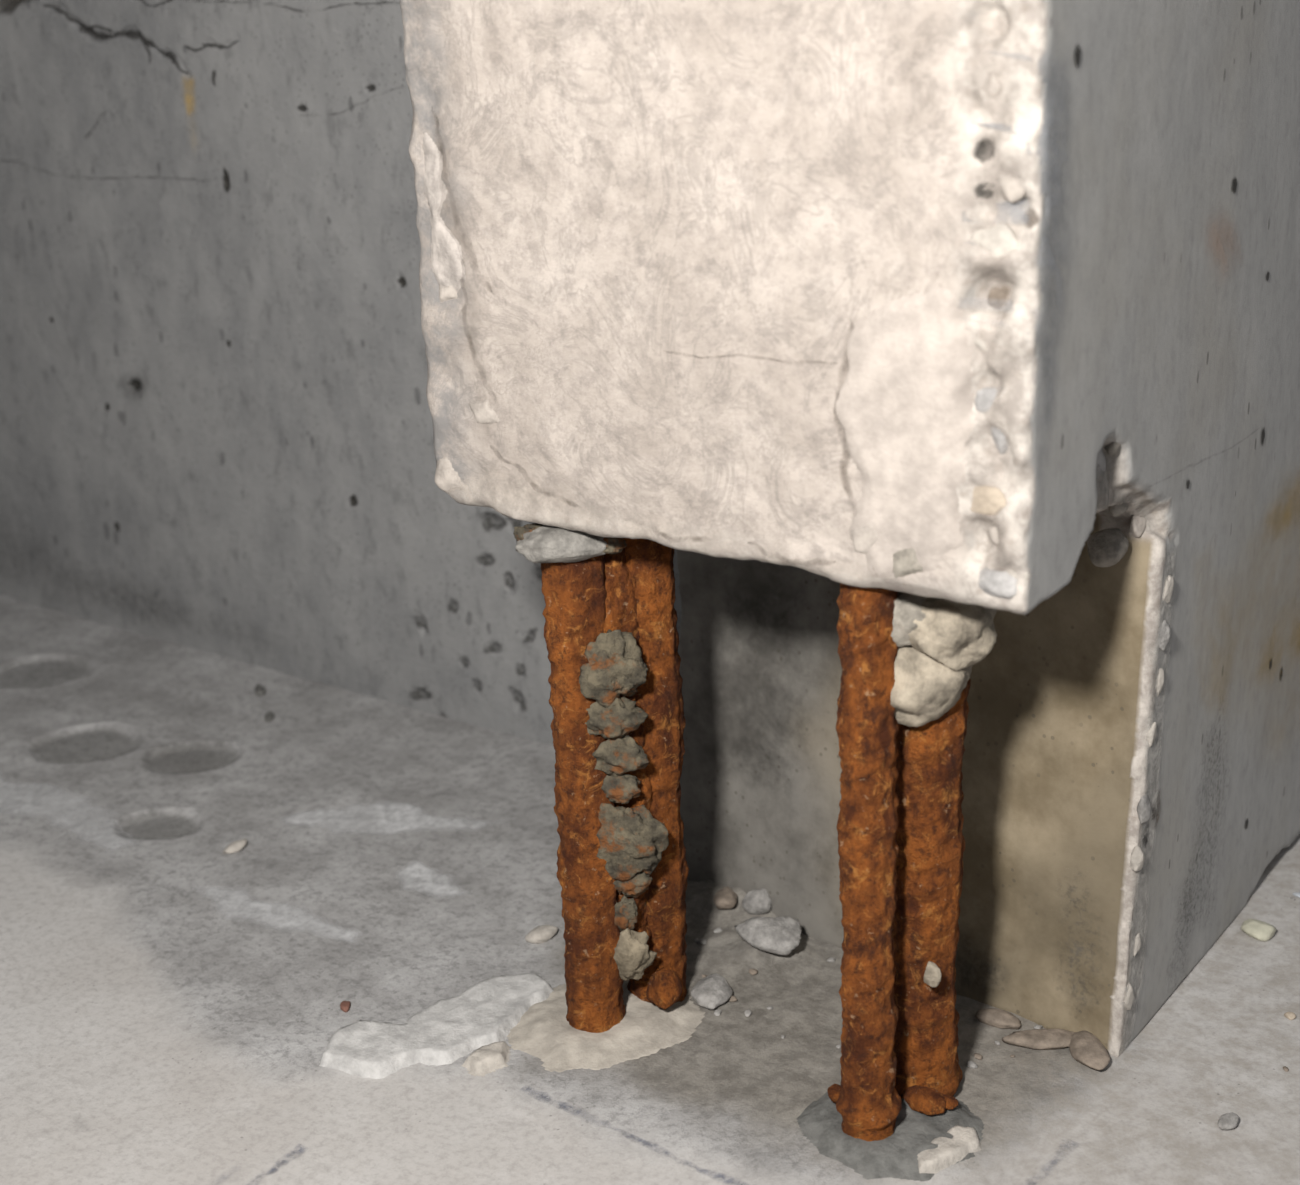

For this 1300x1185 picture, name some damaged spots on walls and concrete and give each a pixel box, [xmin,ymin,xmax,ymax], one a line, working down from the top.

crack [42,0,239,86]
peeling [510,518,543,541]
peeling [603,537,627,554]
rust [604,548,646,664]
rust [620,687,645,746]
spalling [1130,555,1174,872]
rust [614,767,653,810]
rust [617,885,652,946]
rust [644,966,682,1009]
spalling [1124,893,1147,1046]
rust [827,1083,842,1103]
rust [903,1085,959,1116]